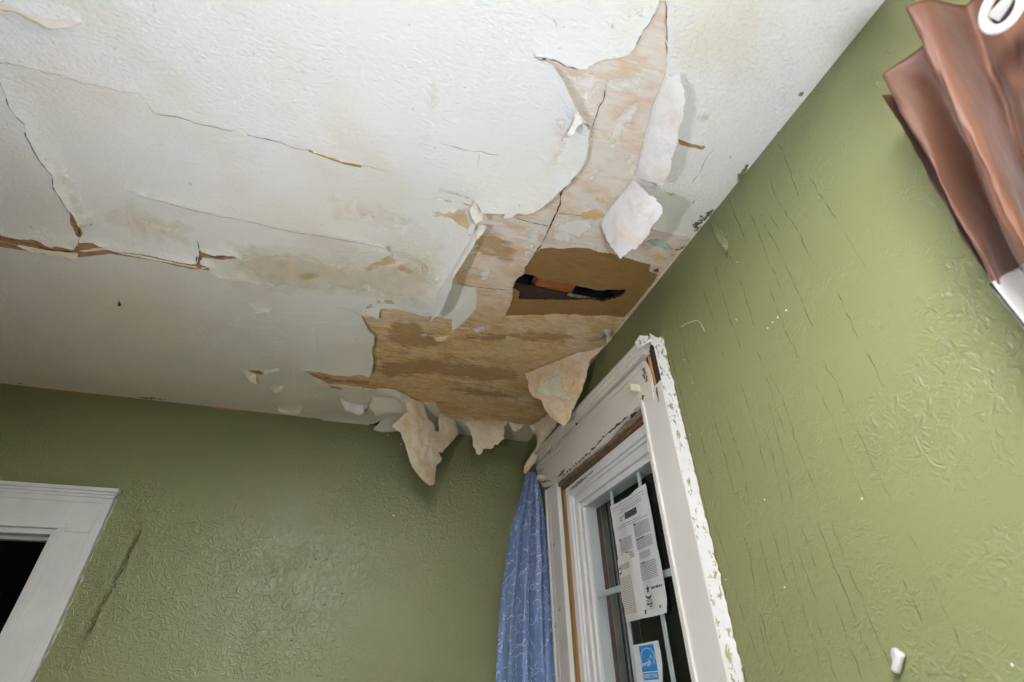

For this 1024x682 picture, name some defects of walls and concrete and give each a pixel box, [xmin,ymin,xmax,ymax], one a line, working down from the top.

crack [0,62,313,252]
peeling [0,0,692,432]
crack [515,177,580,254]
spalling [541,337,744,682]
crack [665,267,893,682]
crack [728,144,891,506]